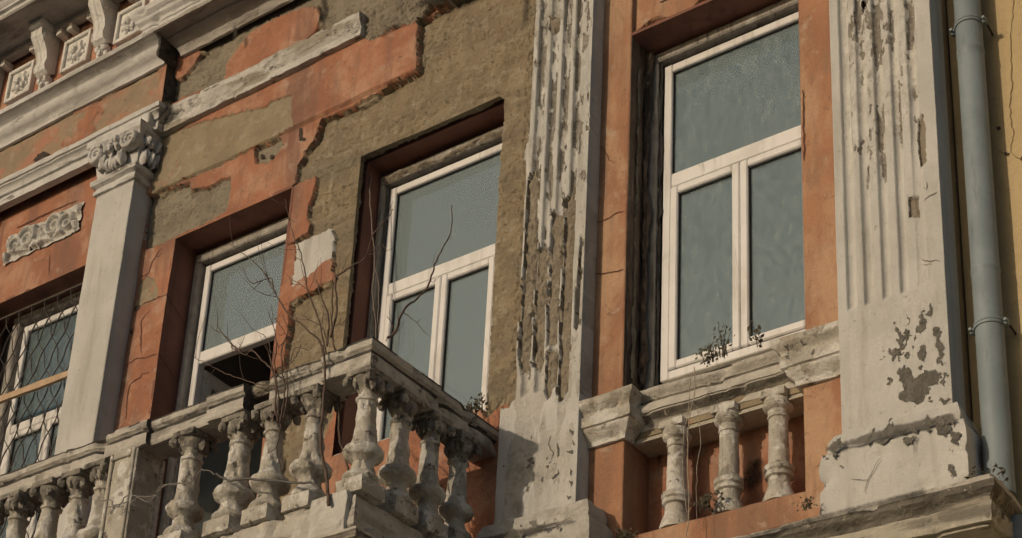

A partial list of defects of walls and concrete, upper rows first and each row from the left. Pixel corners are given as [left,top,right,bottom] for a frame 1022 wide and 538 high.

peeling [143,94,293,250]
flaking render [175,0,385,102]
flaking render [277,0,591,419]
peeling [852,103,887,190]
peeling [847,0,915,146]
flaking render [908,196,920,218]
flaking render [914,114,927,167]
crack [1000,0,1022,160]
peeling [136,276,159,306]
crack [125,294,185,419]
peeling [866,303,961,450]
flaking render [280,415,306,503]